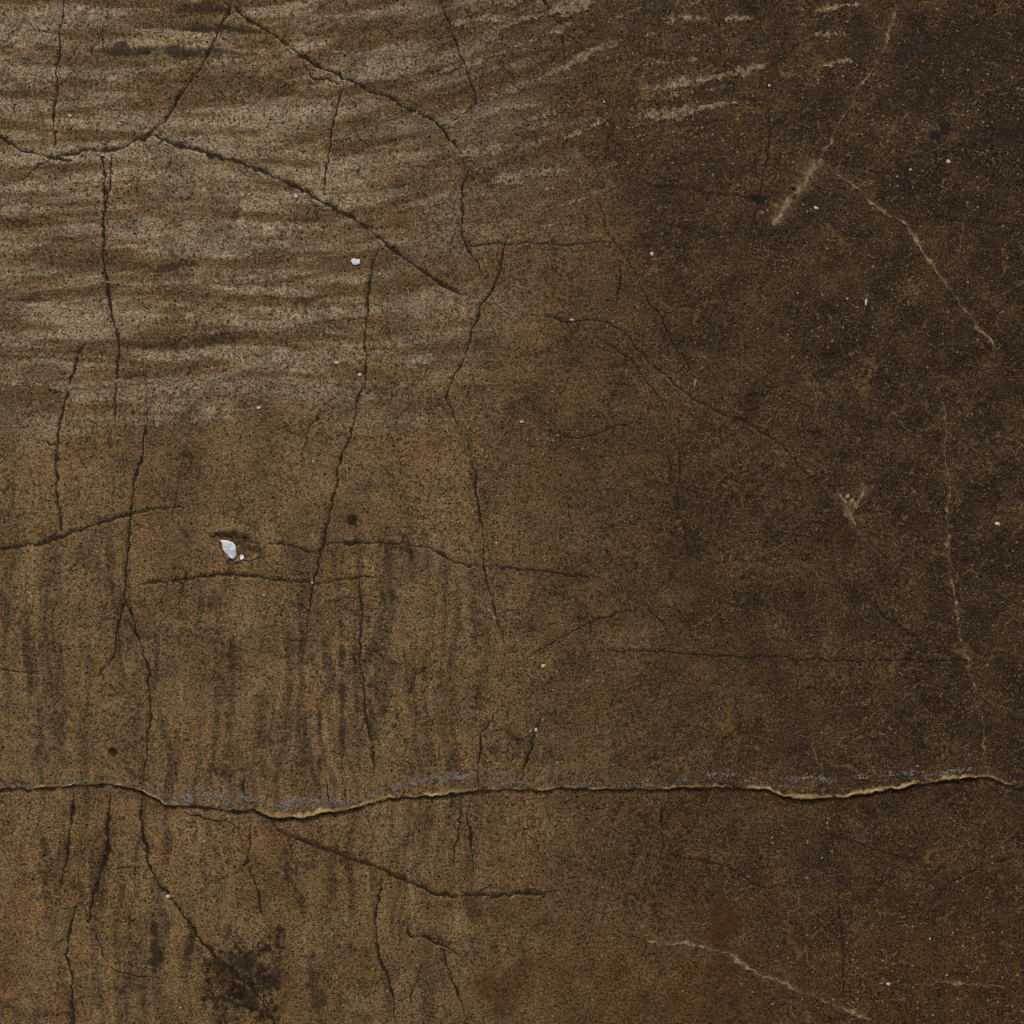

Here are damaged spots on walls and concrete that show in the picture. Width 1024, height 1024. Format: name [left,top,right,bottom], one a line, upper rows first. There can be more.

crack [0,0,692,1024]